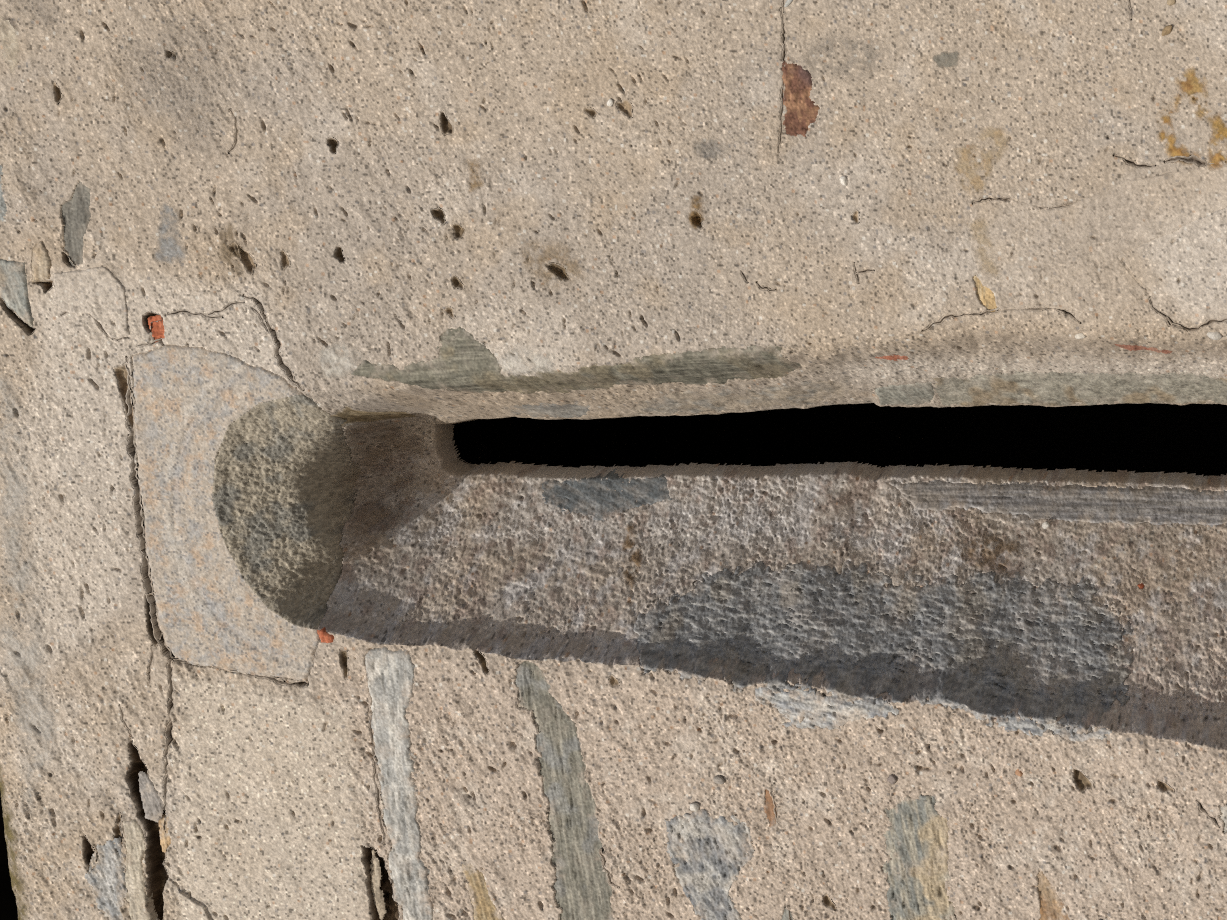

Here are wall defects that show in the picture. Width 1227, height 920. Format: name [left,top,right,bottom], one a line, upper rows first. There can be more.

crack [1114,155,1227,188]
crack [924,299,1081,331]
crack [1149,297,1227,332]
crack [61,294,309,810]